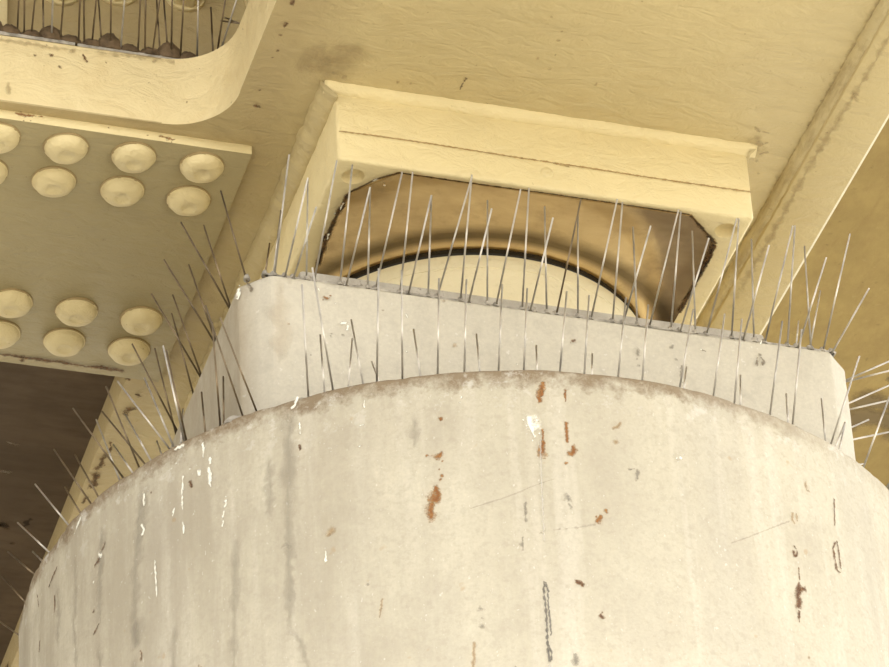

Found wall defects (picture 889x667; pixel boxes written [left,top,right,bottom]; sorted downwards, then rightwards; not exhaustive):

rust [536,382,545,403]
rust [565,422,576,464]
water stain [850,392,889,435]
rust [426,452,444,520]
rust [793,546,807,622]
crack [543,582,552,662]